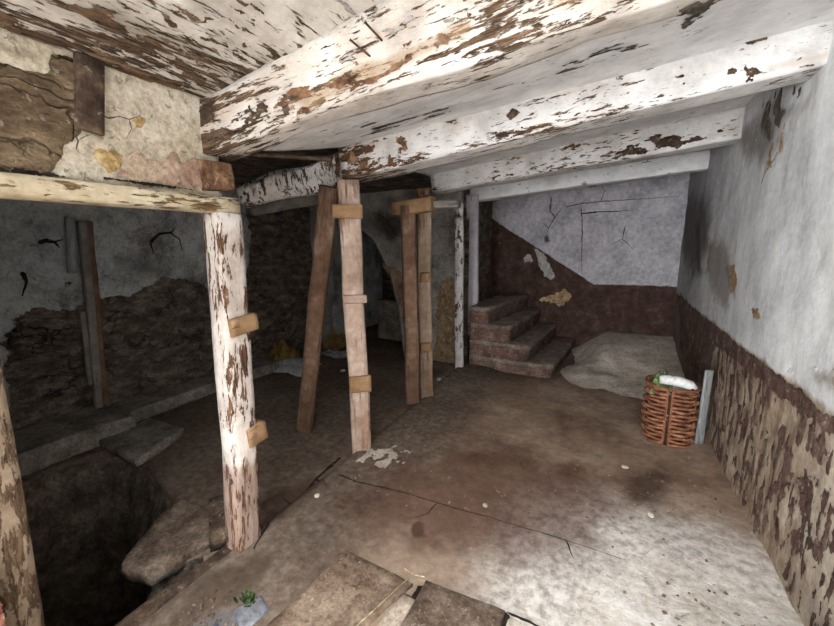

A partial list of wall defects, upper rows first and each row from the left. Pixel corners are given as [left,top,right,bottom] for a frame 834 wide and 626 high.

spalling [0,3,222,174]
peeling [235,86,322,125]
peeling [328,41,416,92]
peeling [549,43,649,74]
peeling [346,107,451,176]
peeling [612,134,707,160]
water stain [683,196,707,271]
spalling [0,296,93,429]
spalling [100,277,214,404]
crack [253,499,292,549]
crack [307,457,625,560]
crack [507,612,539,626]